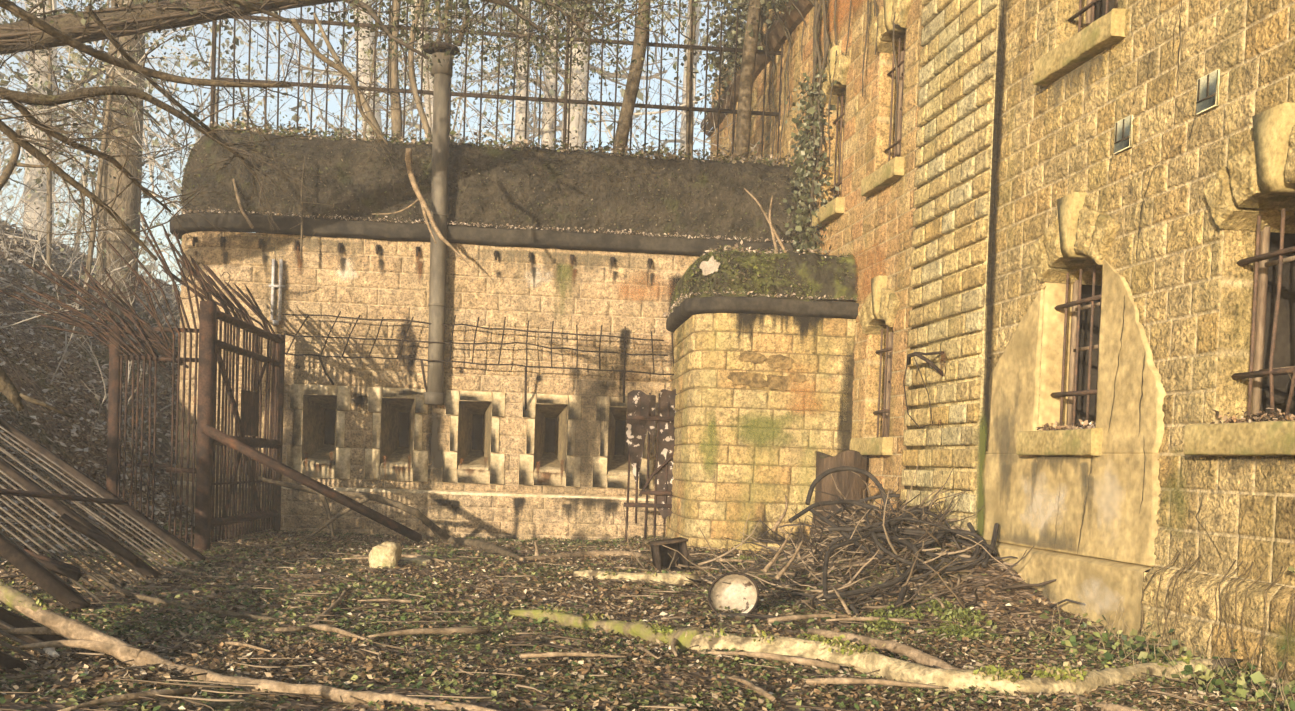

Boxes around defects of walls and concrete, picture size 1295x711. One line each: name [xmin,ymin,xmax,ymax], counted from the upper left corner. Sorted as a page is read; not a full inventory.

leakage [668,276,682,313]
leakage [701,421,717,467]
leakage [741,417,781,443]